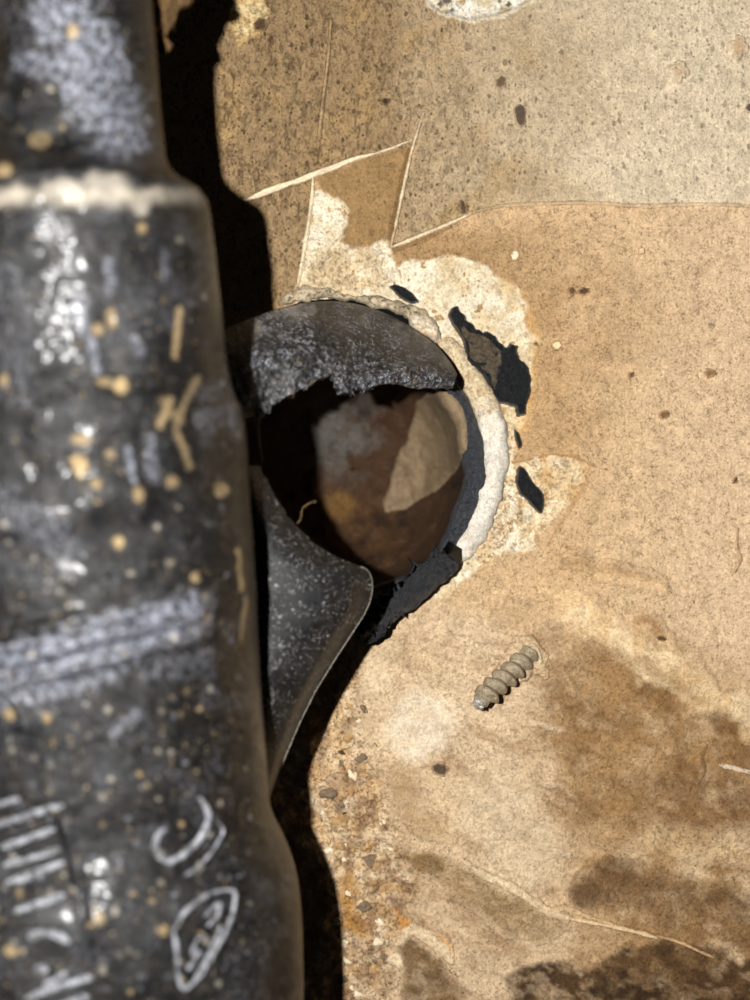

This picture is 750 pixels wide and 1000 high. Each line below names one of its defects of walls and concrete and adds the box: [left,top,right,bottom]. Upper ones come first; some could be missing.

crack [242,111,471,286]
spalling [294,188,594,601]
water stain [358,554,750,1000]
crack [461,858,714,958]